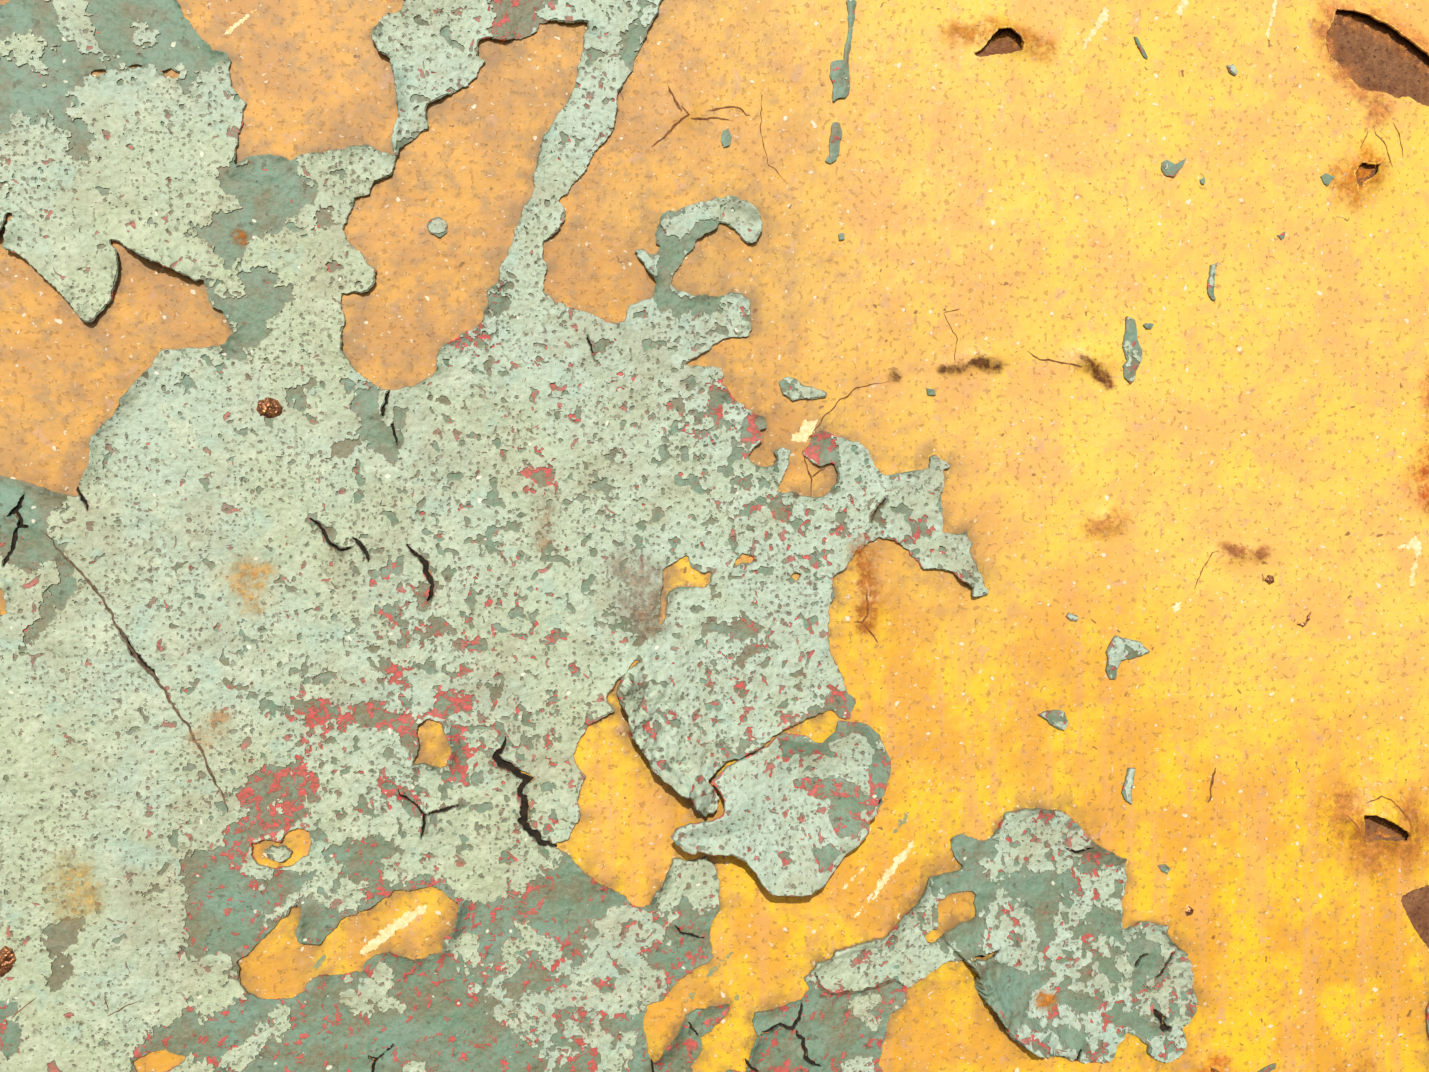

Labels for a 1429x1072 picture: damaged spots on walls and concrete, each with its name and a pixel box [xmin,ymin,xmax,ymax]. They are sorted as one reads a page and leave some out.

peeling [829,0,857,102]
corrosion [948,14,1054,68]
corrosion [1311,0,1429,123]
corrosion [1334,151,1389,202]
peeling [635,196,763,326]
peeling [0,0,587,661]
crack [76,487,89,509]
crack [3,494,228,813]
peeling [130,556,891,1072]
peeling [726,807,1198,1072]
corrosion [1327,790,1429,962]
corrosion [1190,1045,1241,1072]